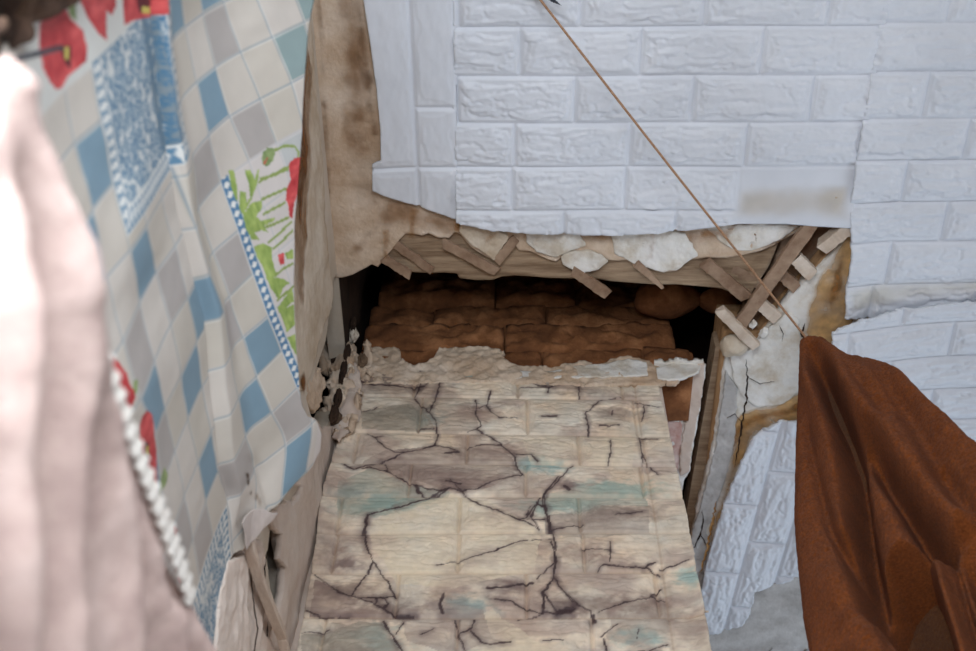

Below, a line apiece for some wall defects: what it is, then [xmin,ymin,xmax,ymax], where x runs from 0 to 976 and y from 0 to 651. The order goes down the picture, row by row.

flaking render [213,0,808,651]
crack [693,513,706,548]
crack [727,360,773,465]
flaking render [691,228,850,588]